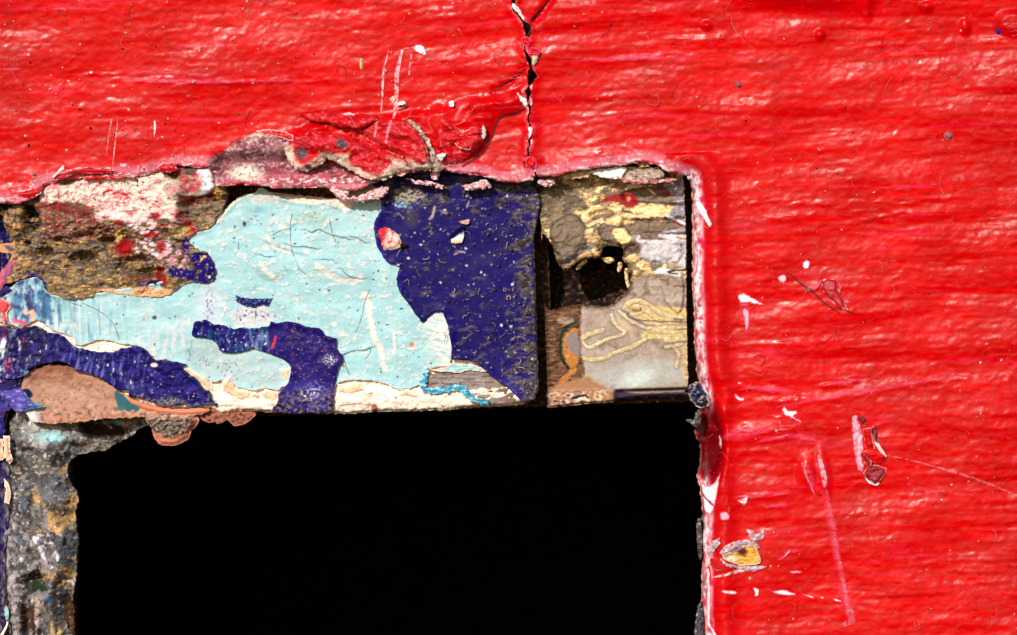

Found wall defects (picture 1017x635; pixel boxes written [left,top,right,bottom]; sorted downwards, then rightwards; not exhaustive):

crack [462,0,549,190]
peeling [0,109,678,464]